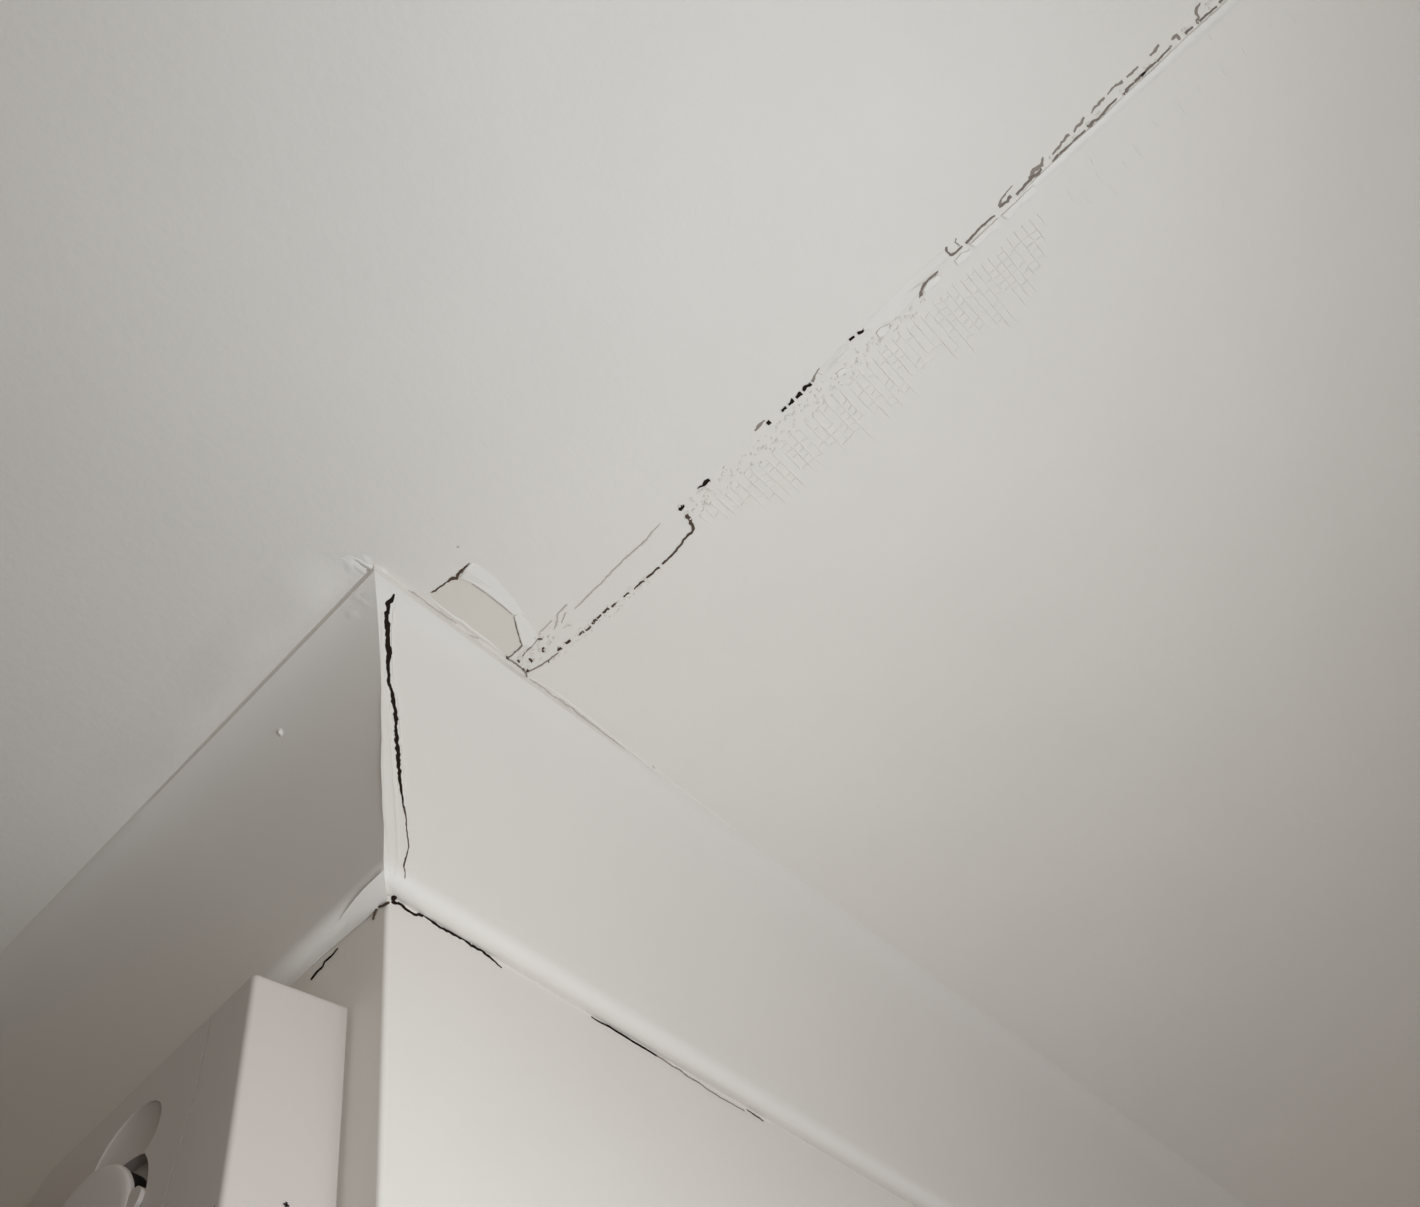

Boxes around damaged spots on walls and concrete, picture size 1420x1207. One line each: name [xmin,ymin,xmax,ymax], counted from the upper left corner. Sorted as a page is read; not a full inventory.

crack [372,0,1314,968]
peeling [428,563,538,658]
crack [591,1016,764,1121]